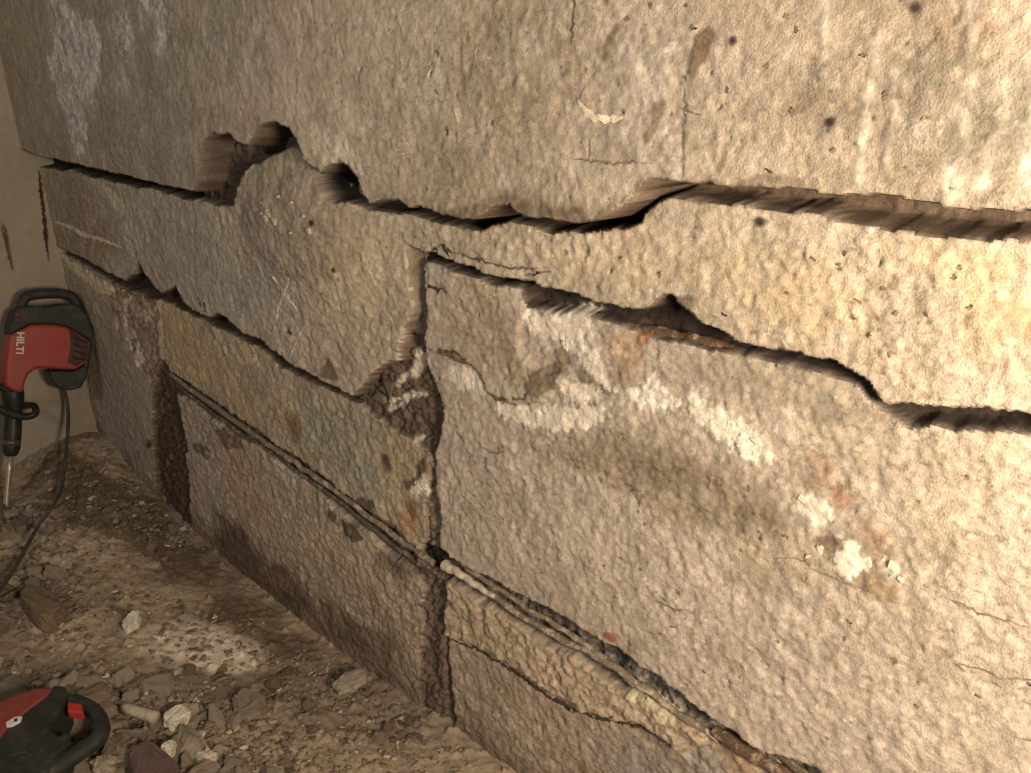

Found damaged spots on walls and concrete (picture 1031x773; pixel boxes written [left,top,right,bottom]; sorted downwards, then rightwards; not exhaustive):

crack [22,149,361,405]
spalling [190,121,398,212]
spalling [447,196,649,223]
crack [357,70,1031,437]
damp [508,389,629,439]
crack [182,378,822,773]
crack [563,433,900,602]
damp [797,485,908,600]
crack [947,598,1027,627]
crack [954,663,1031,699]